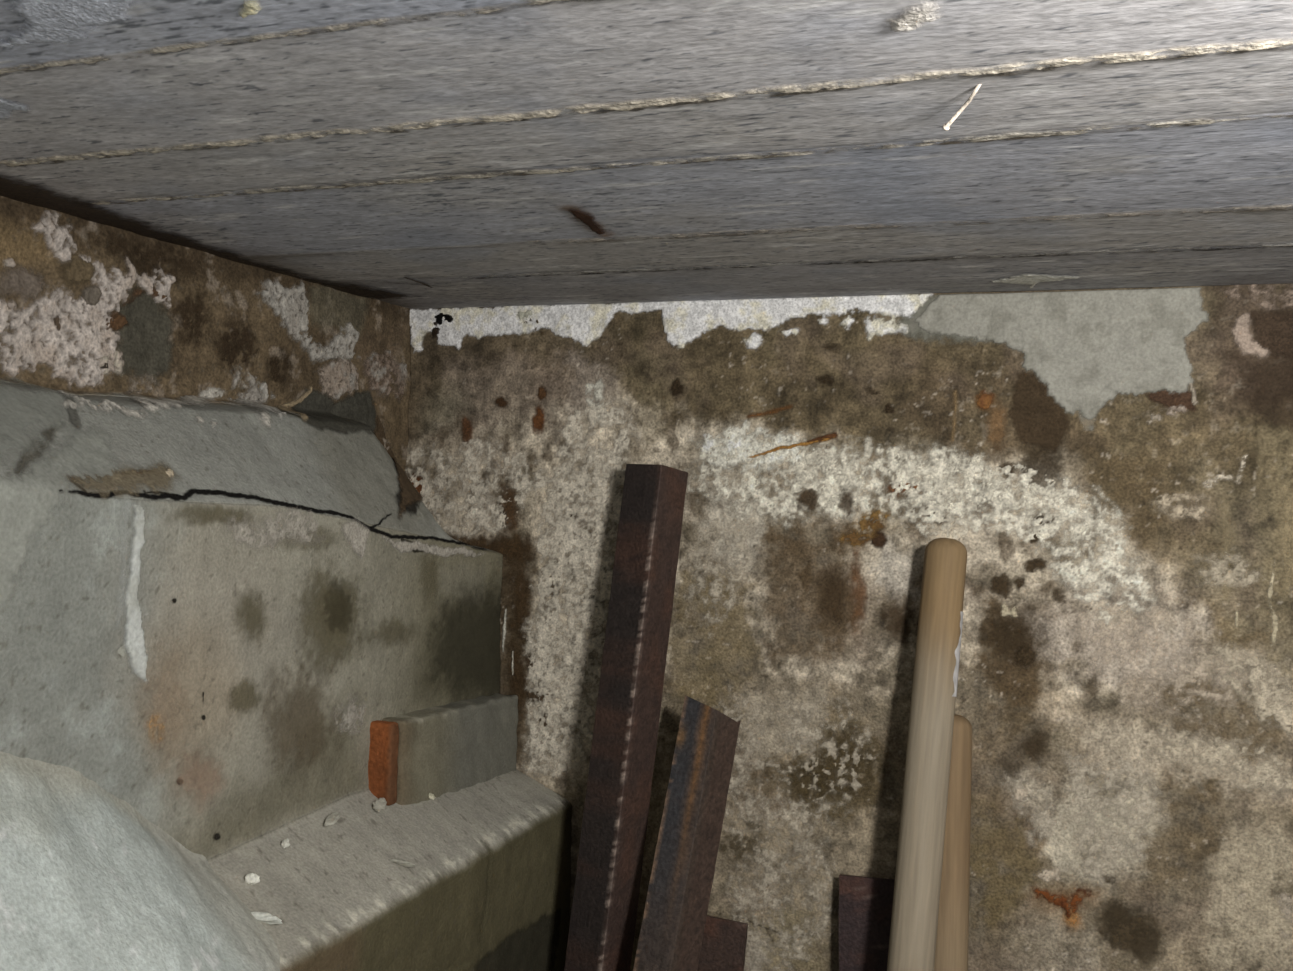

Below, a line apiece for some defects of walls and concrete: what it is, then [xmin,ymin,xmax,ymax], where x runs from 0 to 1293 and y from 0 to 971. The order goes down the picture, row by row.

damp [0,176,408,306]
damp [1251,311,1293,358]
crack [15,392,81,474]
crack [59,476,487,552]
damp [688,372,1293,733]
damp [303,572,361,665]
damp [1154,726,1293,790]
damp [722,700,883,970]
damp [1037,869,1060,882]
rust [1034,888,1092,924]
damp [1067,756,1159,884]
damp [1099,902,1161,963]